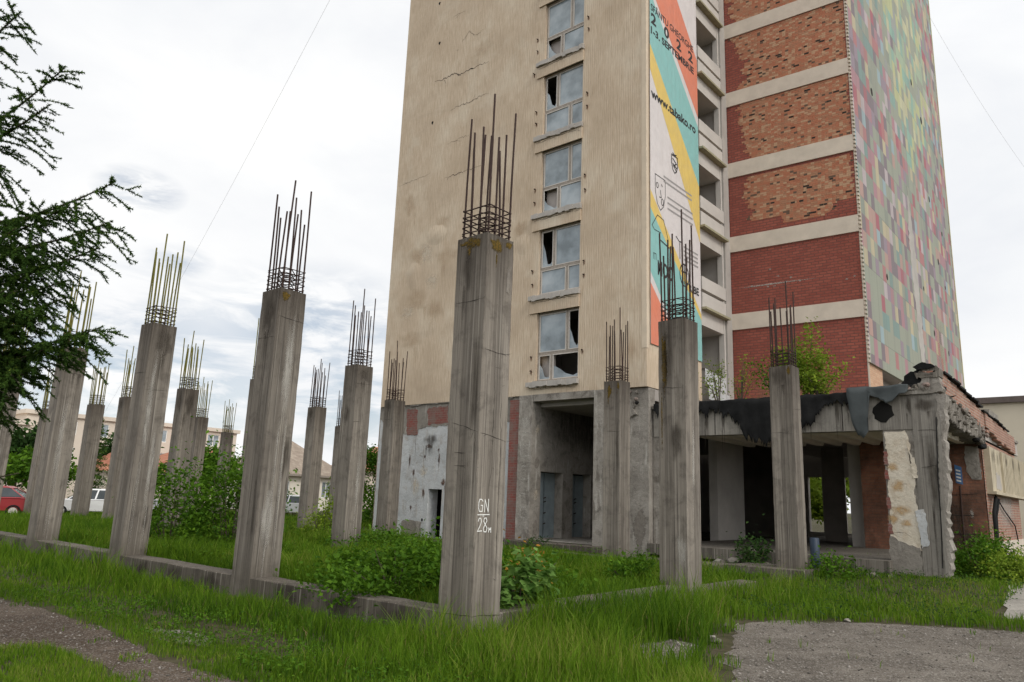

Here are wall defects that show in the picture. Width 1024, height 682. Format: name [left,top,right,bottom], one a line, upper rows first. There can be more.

crack [435,12,485,83]
spalling [723,0,846,90]
spalling [735,74,851,159]
spalling [804,203,841,220]
spalling [942,393,986,480]
peeling [883,430,930,576]